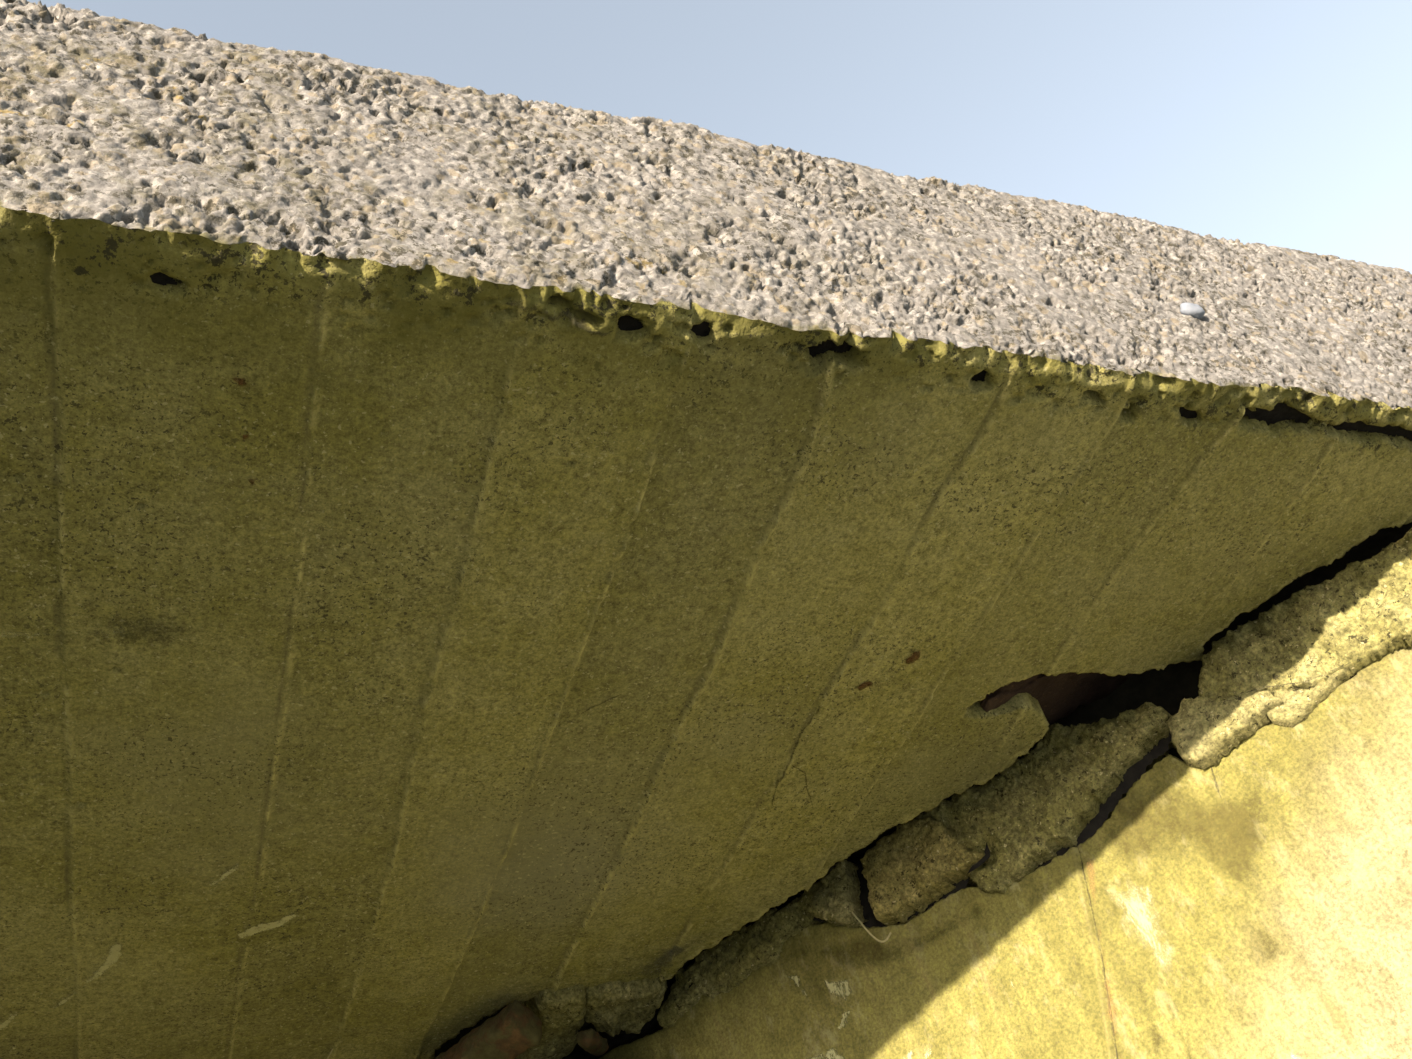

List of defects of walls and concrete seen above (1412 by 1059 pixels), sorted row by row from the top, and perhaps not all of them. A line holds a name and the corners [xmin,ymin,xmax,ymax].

crack [1292,526,1399,582]
crack [1240,662,1357,694]
crack [772,709,819,802]
crack [814,826,990,928]
crack [1036,732,1172,1059]
water stain [1117,887,1172,964]
crack [584,1013,658,1058]